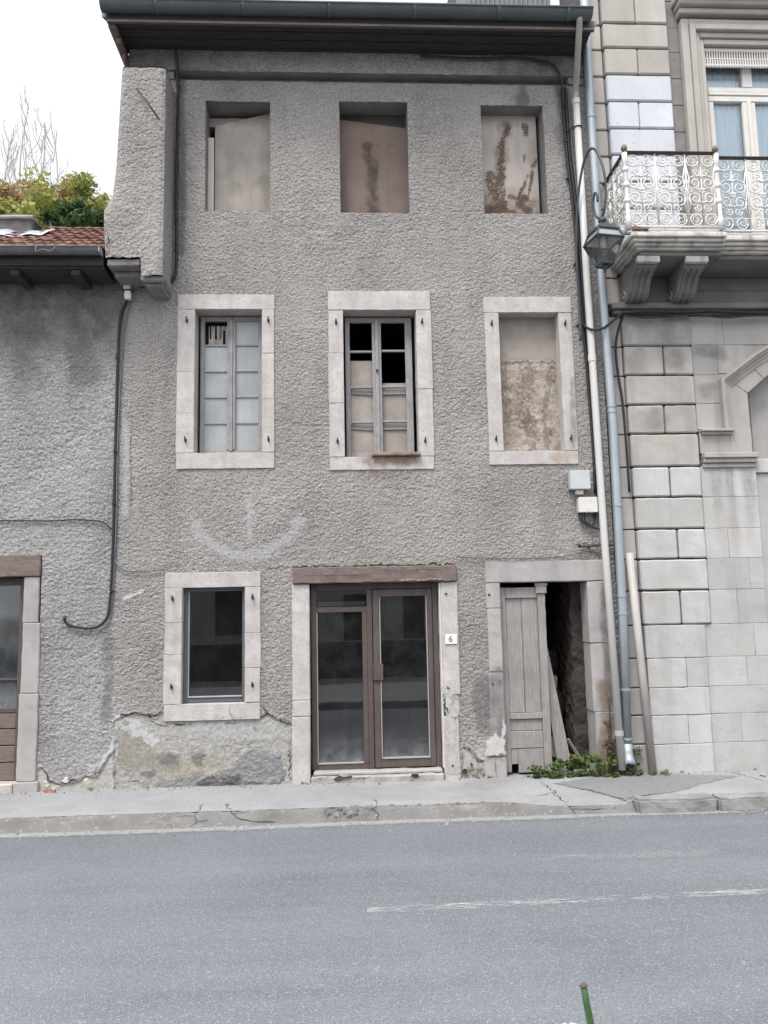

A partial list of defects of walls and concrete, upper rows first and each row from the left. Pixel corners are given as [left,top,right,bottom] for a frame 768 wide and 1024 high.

flaking render [36,712,292,791]
crack [177,803,274,826]